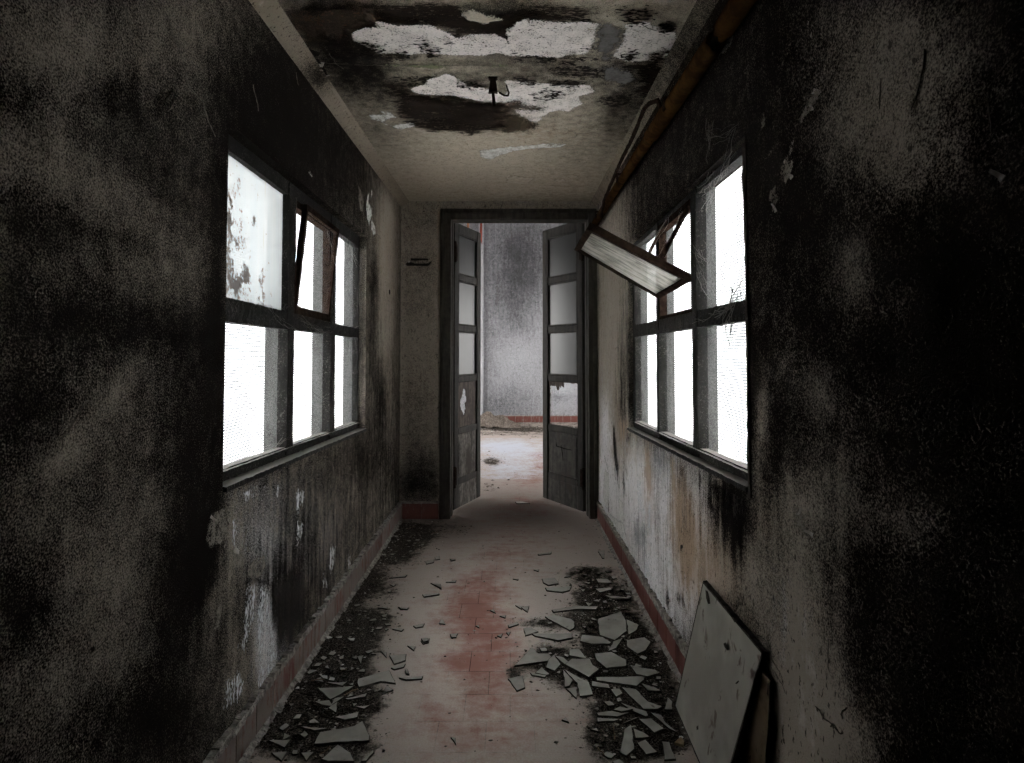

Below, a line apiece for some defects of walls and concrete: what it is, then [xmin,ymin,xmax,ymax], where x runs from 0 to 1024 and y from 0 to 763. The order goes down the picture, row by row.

peeling [352,18,601,58]
peeling [614,21,677,62]
leakage [288,0,676,136]
peeling [411,74,594,123]
peeling [479,143,566,159]
peeling [359,189,376,234]
leakage [612,427,651,578]
peeling [206,508,237,548]
leakage [242,564,306,688]
leakage [226,670,244,706]